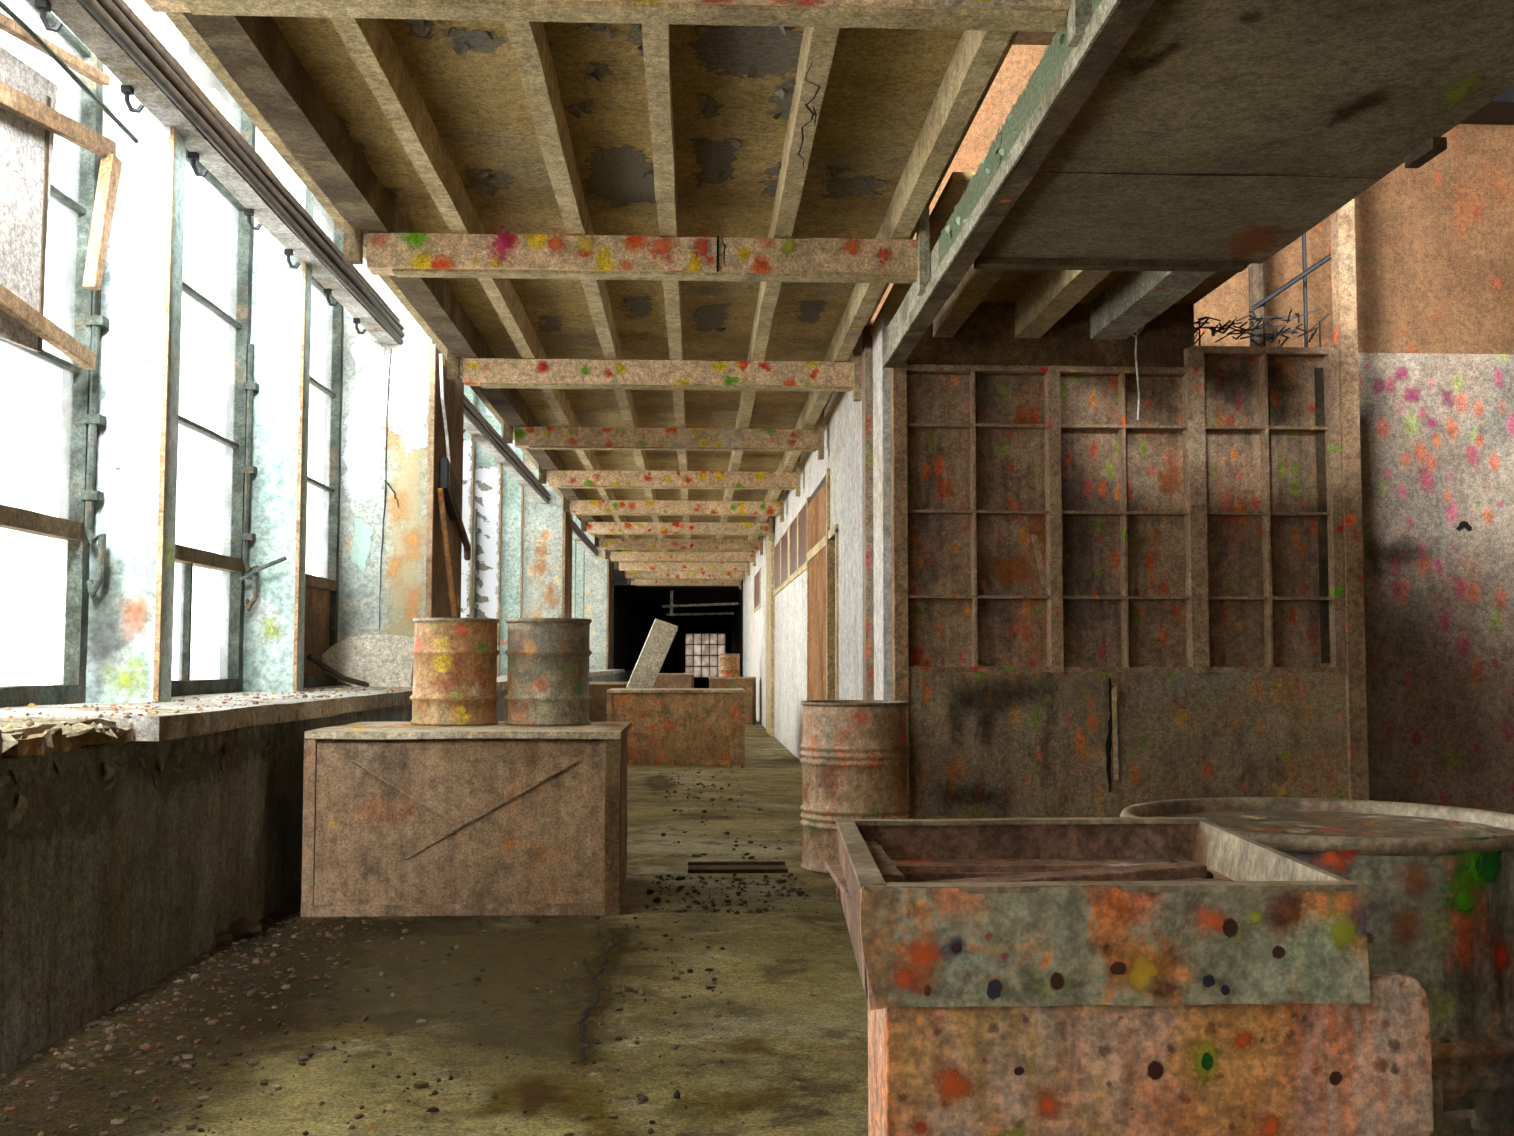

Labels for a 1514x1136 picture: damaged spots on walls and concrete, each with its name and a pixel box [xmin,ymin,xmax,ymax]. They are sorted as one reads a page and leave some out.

peeling [108,103,170,361]
peeling [341,338,429,574]
crack [1105,678,1119,792]